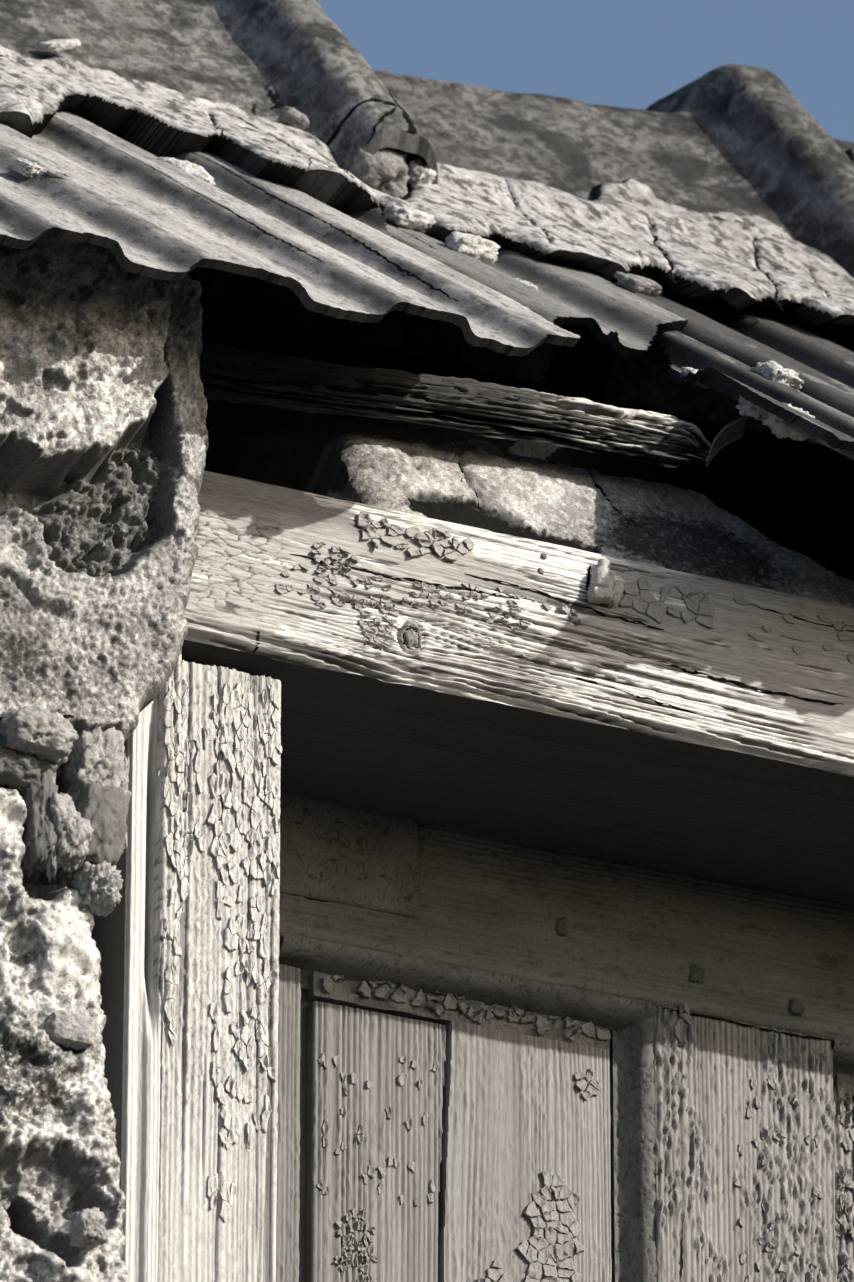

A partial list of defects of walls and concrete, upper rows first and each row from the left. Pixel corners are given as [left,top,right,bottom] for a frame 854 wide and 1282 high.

crack [190,84,458,301]
crack [505,181,573,244]
crack [637,219,678,284]
crack [703,213,784,311]
peeling [357,512,475,561]
peeling [275,542,582,651]
peeling [618,576,715,629]
peeling [157,678,282,1150]
peeling [322,974,611,1041]
peeling [207,1171,237,1223]
peeling [334,1208,379,1282]
peeling [477,1171,586,1282]